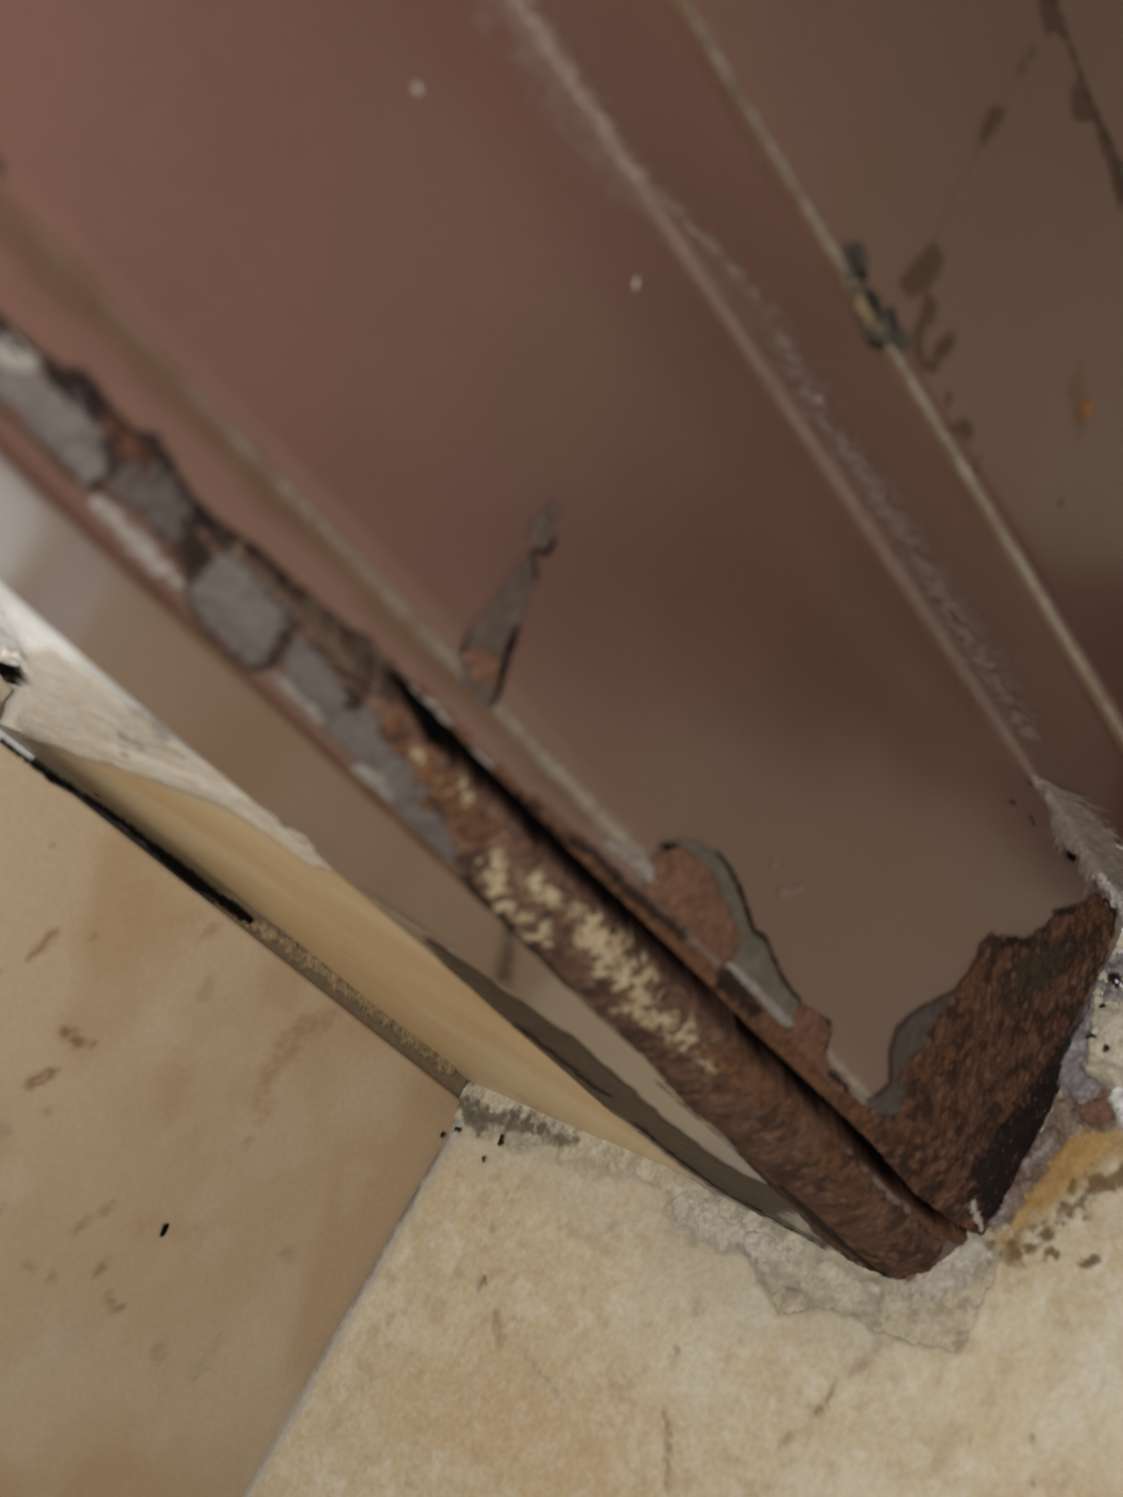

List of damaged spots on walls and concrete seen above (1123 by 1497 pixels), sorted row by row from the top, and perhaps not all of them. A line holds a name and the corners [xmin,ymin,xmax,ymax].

crack [0,318,326,610]
peeling [0,322,464,871]
peeling [689,9,1123,737]
corrosion [177,509,1123,1281]
crack [389,670,939,1215]
peeling [493,703,876,1102]
spalling [1108,972,1123,988]